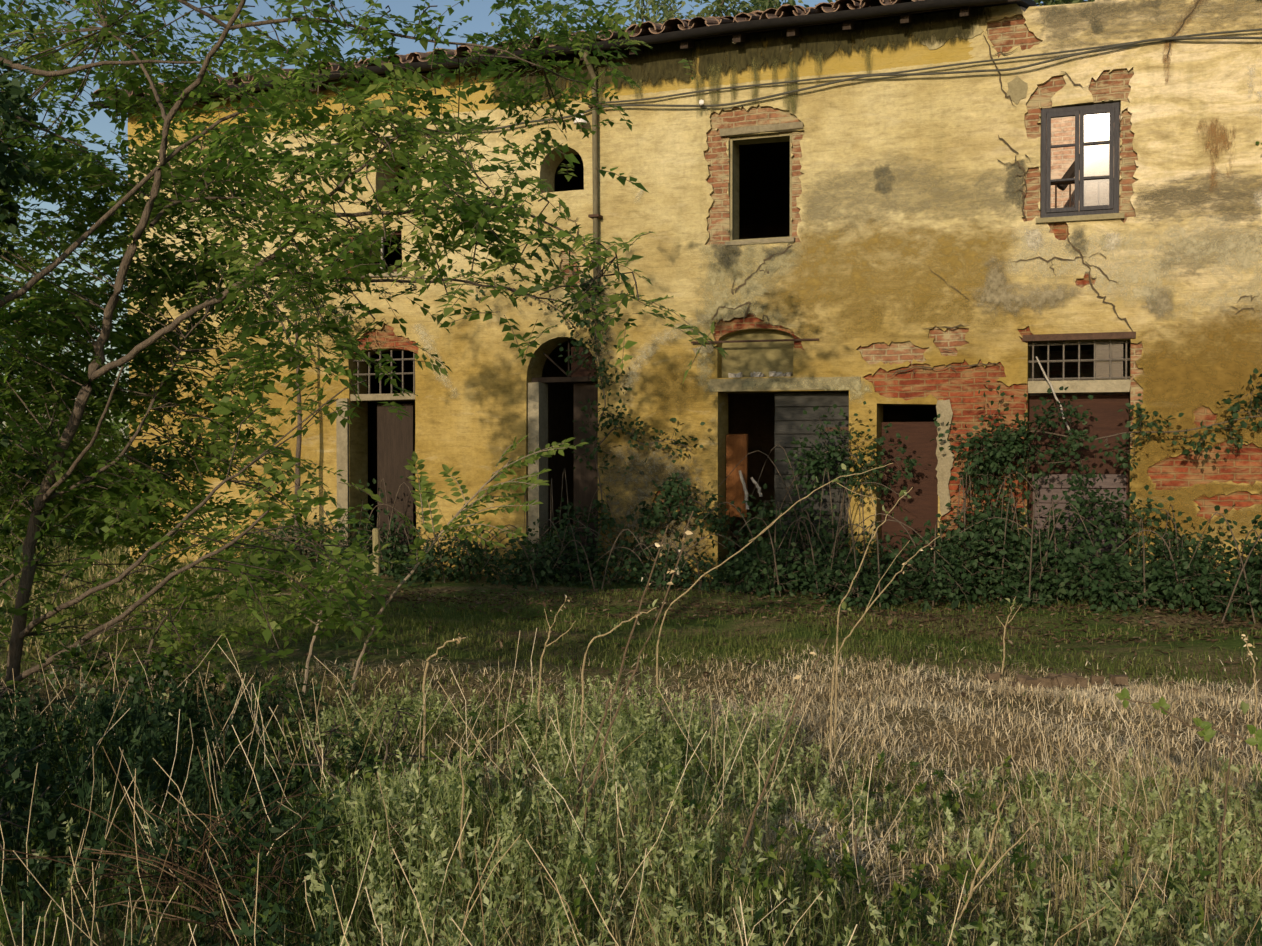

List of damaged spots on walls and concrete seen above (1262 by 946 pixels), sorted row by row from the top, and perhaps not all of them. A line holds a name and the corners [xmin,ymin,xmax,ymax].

leakage [492,6,991,114]
flaking render [705,105,805,277]
flaking render [922,15,1042,58]
flaking render [1024,76,1066,139]
flaking render [1021,167,1069,240]
flaking render [1089,68,1138,223]
leakage [1135,172,1262,272]
crack [712,245,792,321]
crack [1010,235,1134,333]
flaking render [857,326,1028,547]
leakage [1130,287,1262,541]
flaking render [1146,439,1262,523]